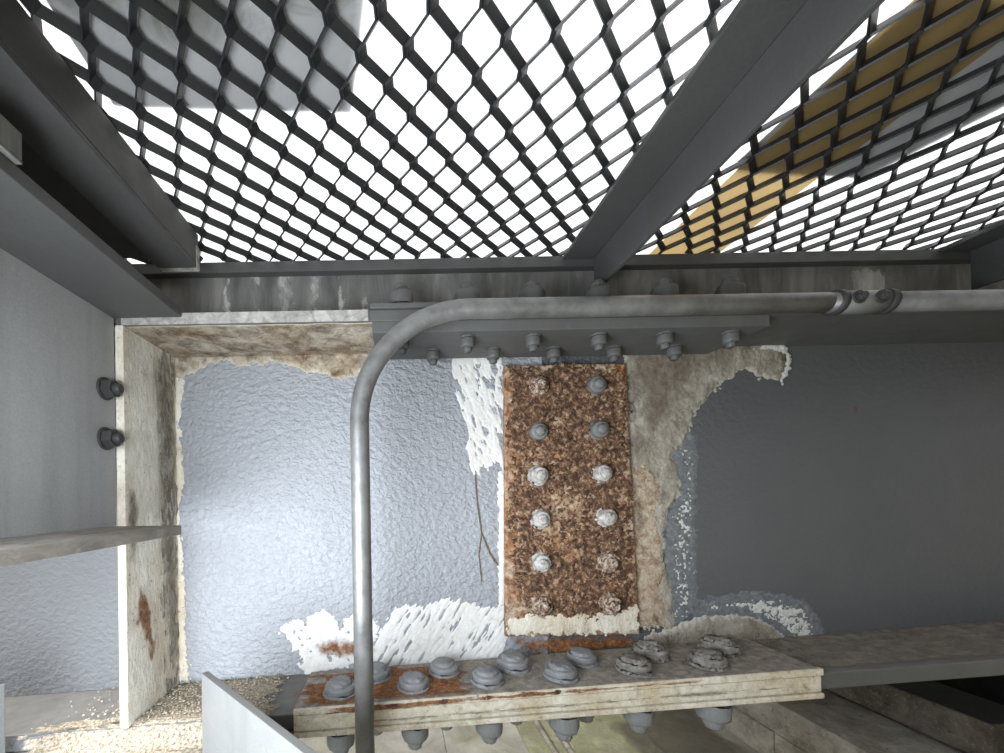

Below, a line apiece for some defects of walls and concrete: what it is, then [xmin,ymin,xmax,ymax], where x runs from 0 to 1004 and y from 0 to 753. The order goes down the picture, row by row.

peeling [114,322,374,694]
crack [475,471,499,582]
rust [504,363,638,622]
spalling [372,345,826,666]
rust [137,591,155,660]
rust [322,642,354,655]
rust [517,637,632,653]
rust [293,673,355,714]
rust [374,667,618,710]